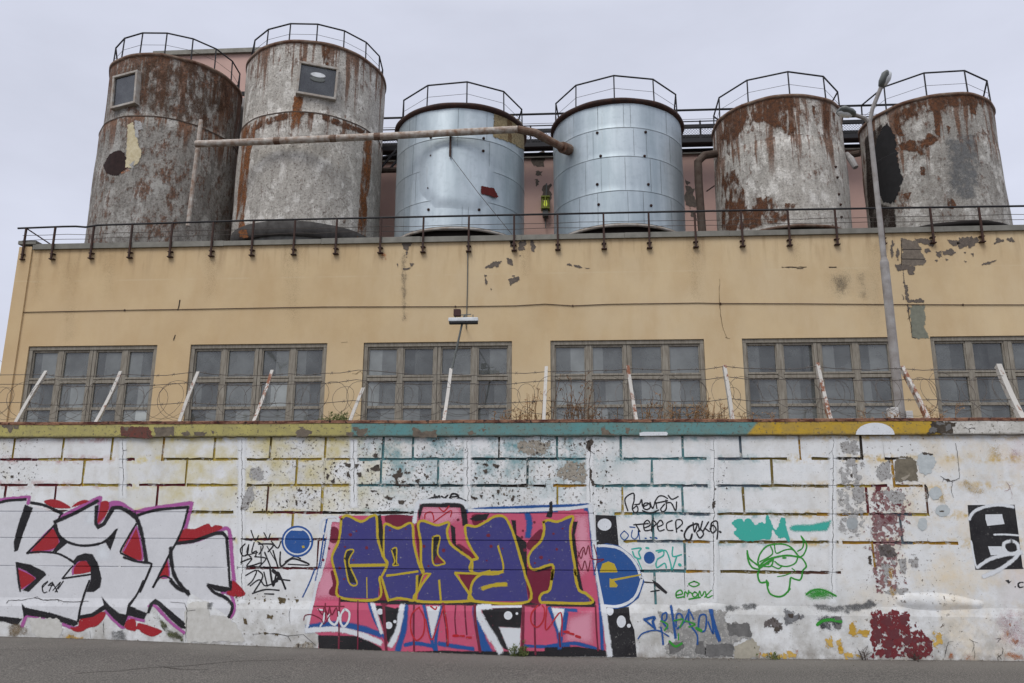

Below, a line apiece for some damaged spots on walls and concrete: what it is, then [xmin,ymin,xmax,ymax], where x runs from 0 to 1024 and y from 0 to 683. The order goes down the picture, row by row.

peeling [125,120,143,169]
rust [121,56,228,127]
rust [236,96,372,238]
rust [719,97,797,156]
rust [721,169,795,231]
rust [812,102,835,138]
rust [864,95,989,228]
peeling [484,240,536,290]
spalling [890,236,996,312]
spalling [846,452,936,595]